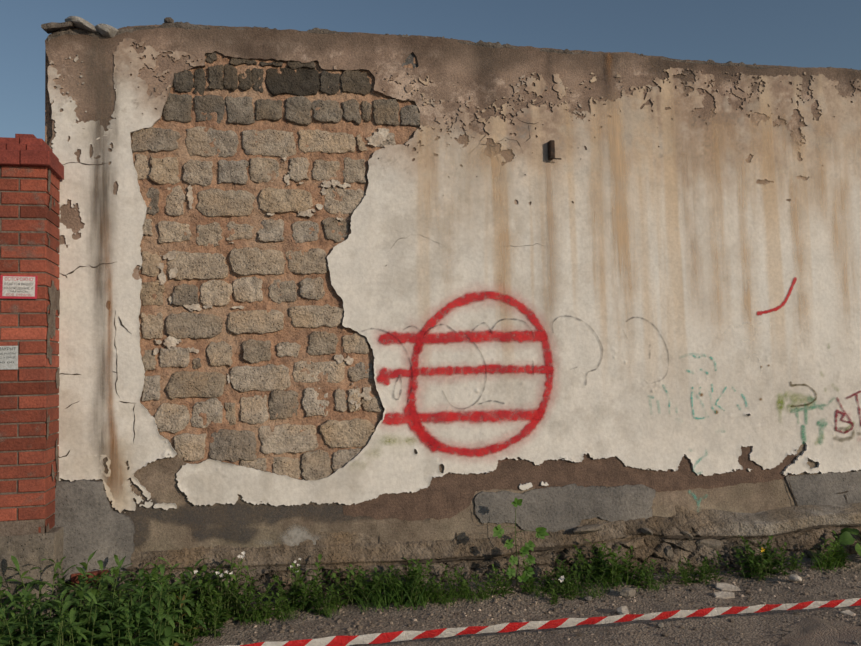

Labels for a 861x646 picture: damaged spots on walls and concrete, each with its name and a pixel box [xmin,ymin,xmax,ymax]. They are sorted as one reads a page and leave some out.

crack [60,262,114,278]
spalling [45,24,861,481]
water stain [609,112,628,272]
crack [112,311,135,441]
peeling [342,446,796,521]